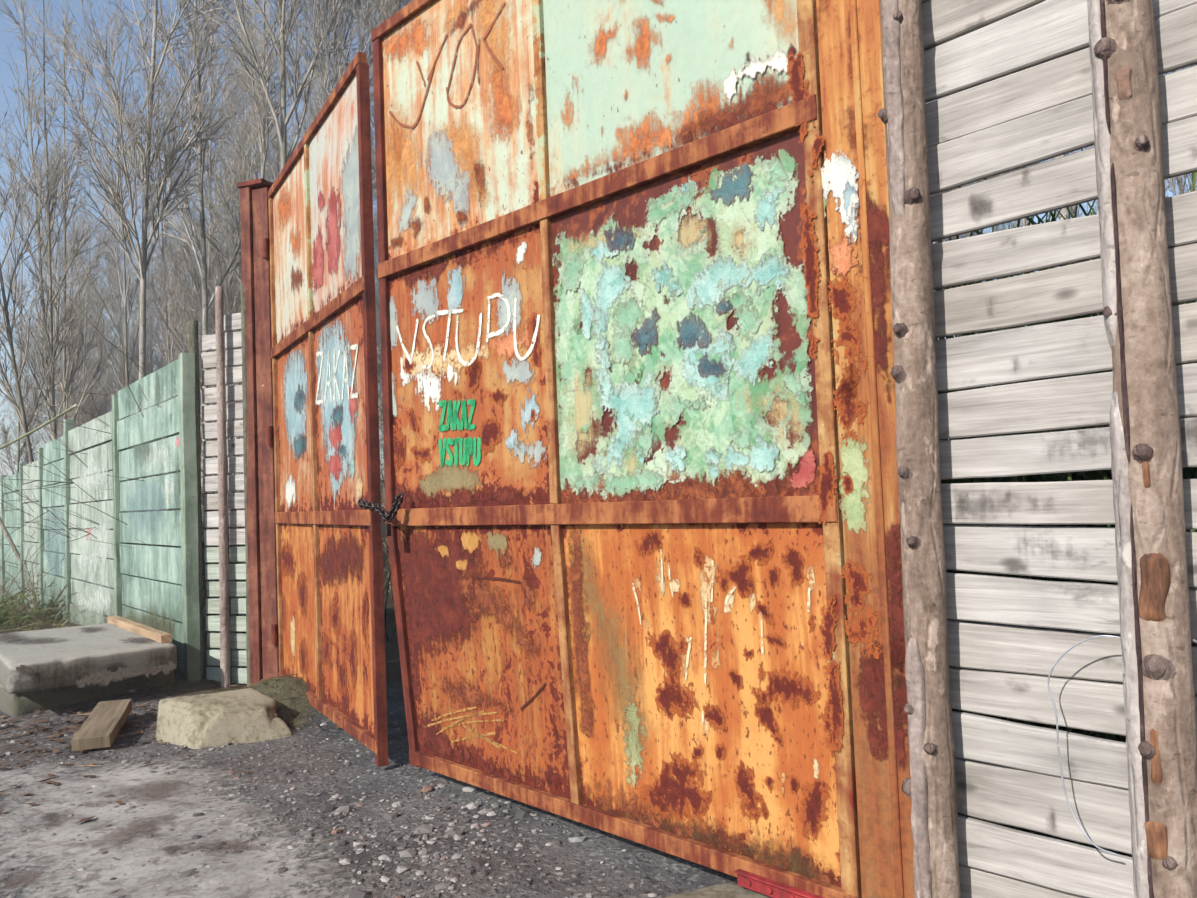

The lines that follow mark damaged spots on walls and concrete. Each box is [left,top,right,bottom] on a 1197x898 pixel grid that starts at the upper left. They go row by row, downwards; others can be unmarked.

corrosion [384,107,430,248]
corrosion [442,0,534,204]
corrosion [626,0,675,68]
corrosion [562,74,792,188]
peeling [723,43,811,106]
peeling [283,317,363,508]
peeling [390,119,871,535]
corrosion [856,189,894,401]
corrosion [281,529,369,696]
corrosion [397,527,559,788]
corrosion [568,528,593,737]
corrosion [857,524,908,769]